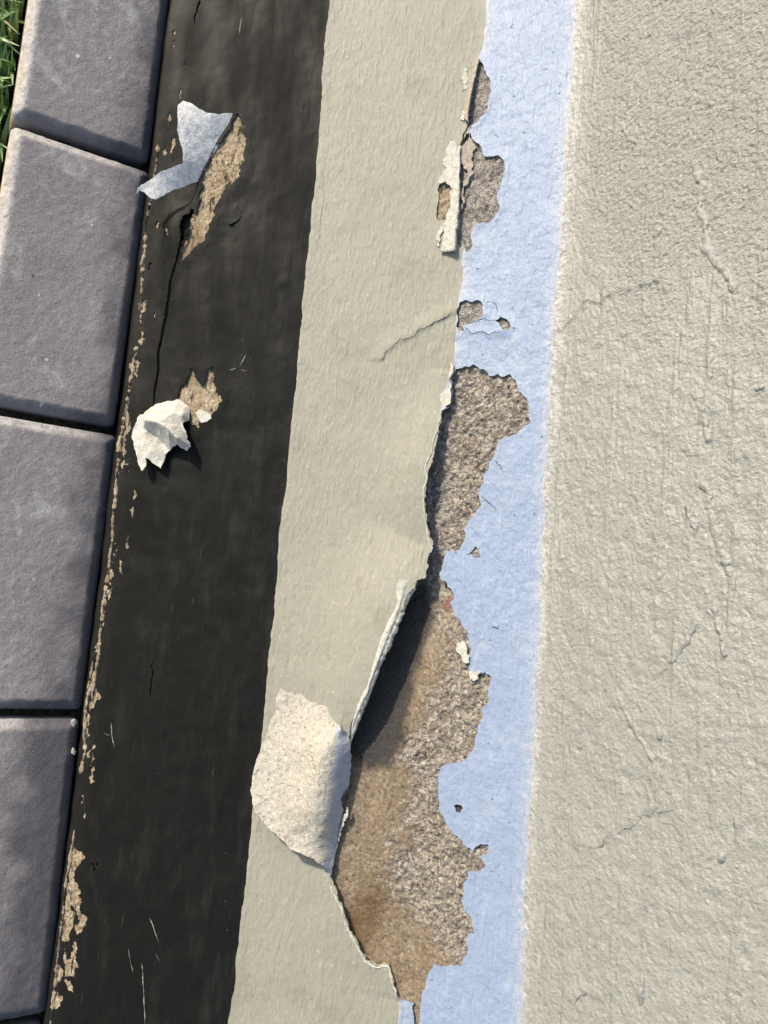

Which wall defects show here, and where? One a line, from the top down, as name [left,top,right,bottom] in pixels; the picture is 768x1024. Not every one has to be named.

peeling [436,57,505,253]
spalling [457,301,511,334]
peeling [79,89,246,784]
spalling [250,361,530,1024]
peeling [50,830,87,1024]